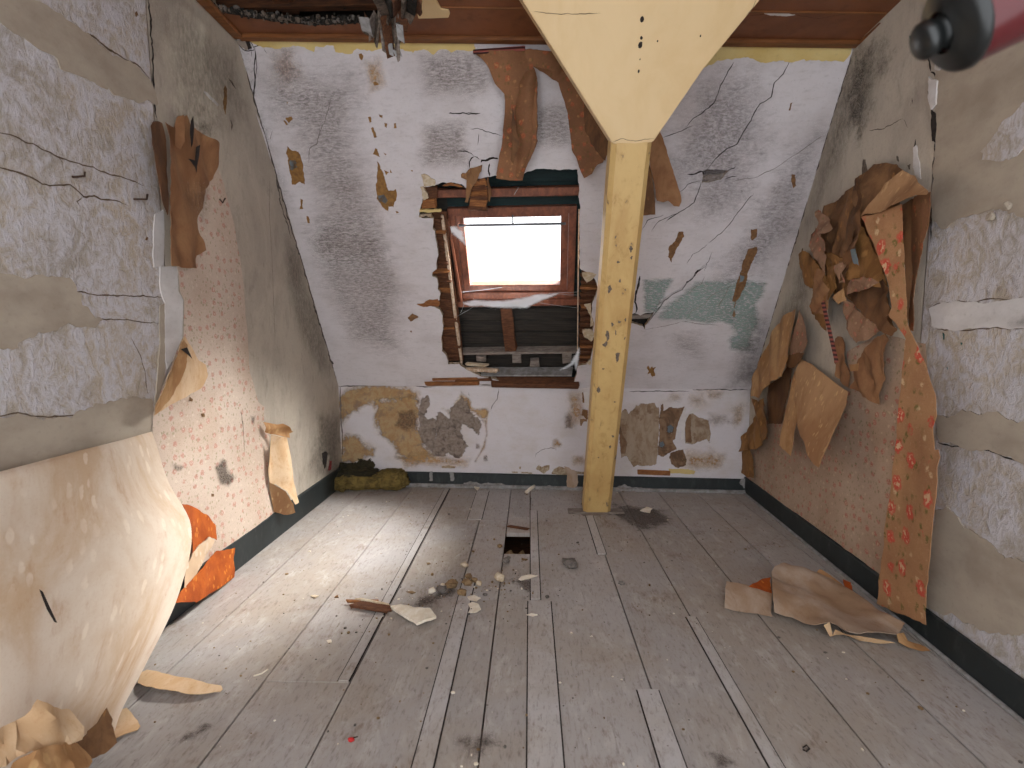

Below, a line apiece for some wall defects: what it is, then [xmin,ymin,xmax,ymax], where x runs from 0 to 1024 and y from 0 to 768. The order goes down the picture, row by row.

peeling [237,40,382,60]
peeling [400,43,475,55]
crack [613,62,734,142]
crack [0,132,143,207]
crack [634,57,851,329]
peeling [732,229,758,317]
flaking render [0,210,183,471]
flaking render [929,298,1024,345]
spalling [418,395,505,490]
flaking render [609,401,711,474]